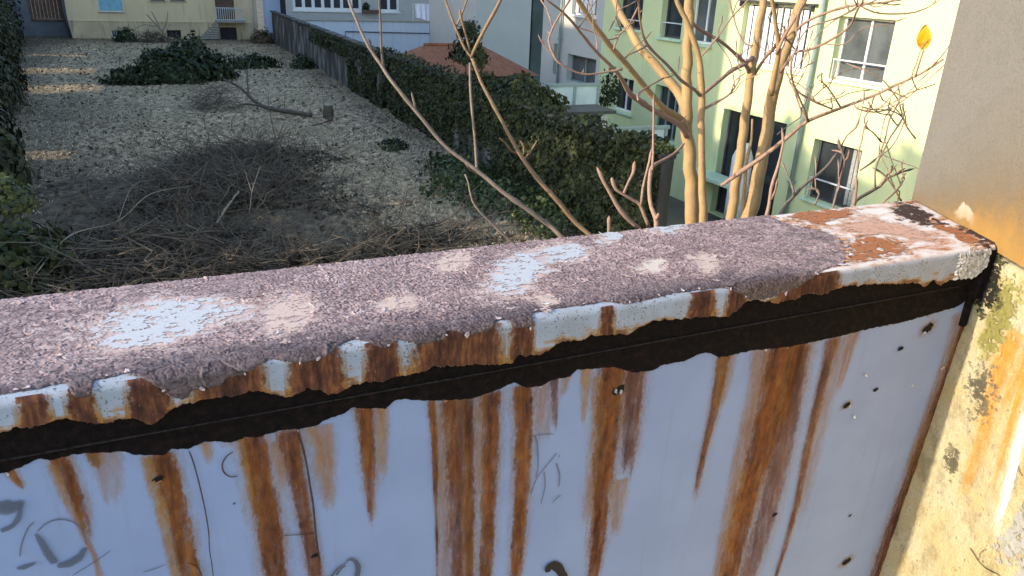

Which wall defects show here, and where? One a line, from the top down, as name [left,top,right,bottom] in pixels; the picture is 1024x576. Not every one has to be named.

rust [780,201,1024,267]
rust [15,388,104,428]
rust [145,453,200,576]
rust [239,426,333,576]
rust [428,391,500,576]
peeling [0,201,997,476]
rust [511,386,533,576]
rust [581,367,644,576]
rust [696,356,729,487]
rust [719,338,854,576]
leakage [963,255,1024,426]
leakage [995,413,1024,523]